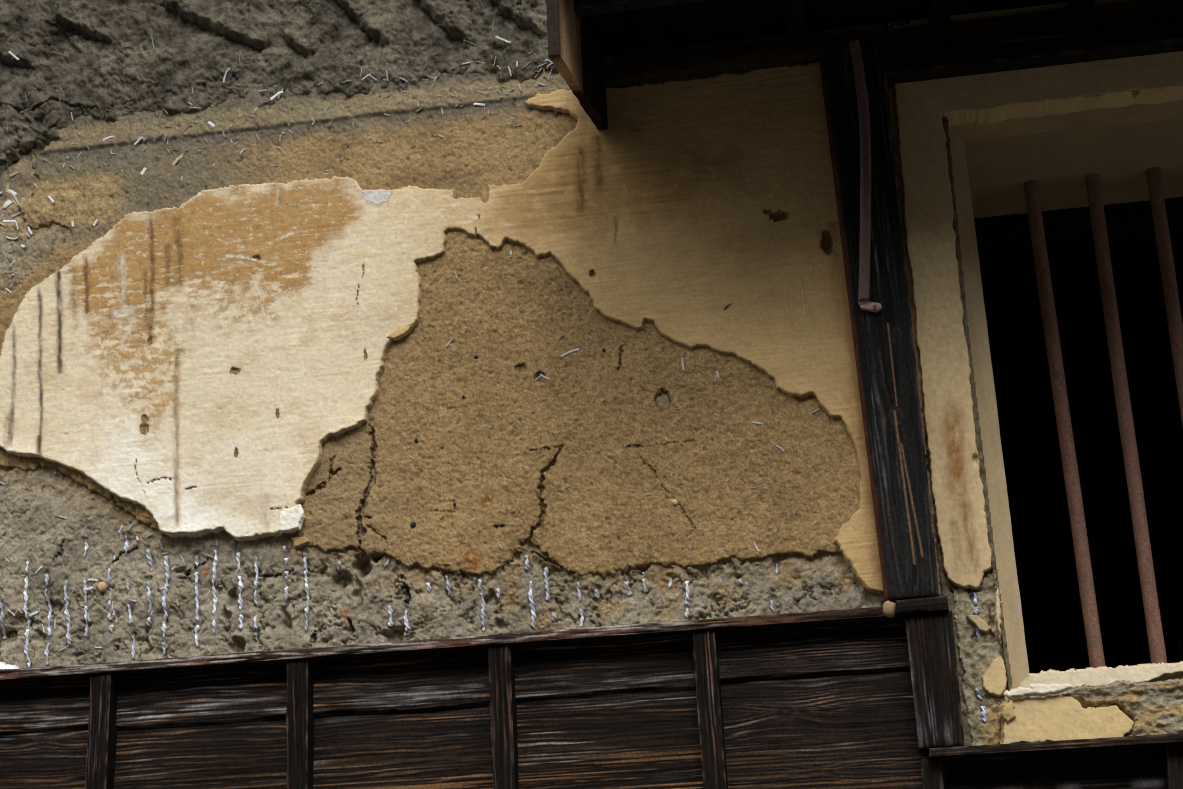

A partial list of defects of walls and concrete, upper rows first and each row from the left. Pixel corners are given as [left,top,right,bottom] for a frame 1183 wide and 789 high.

spalling [0,447,166,536]
water stain [57,179,360,447]
spalling [0,54,578,356]
crack [270,419,387,558]
crack [493,444,566,570]
spalling [279,230,861,579]
spalling [888,87,929,468]
spalling [951,573,1183,746]